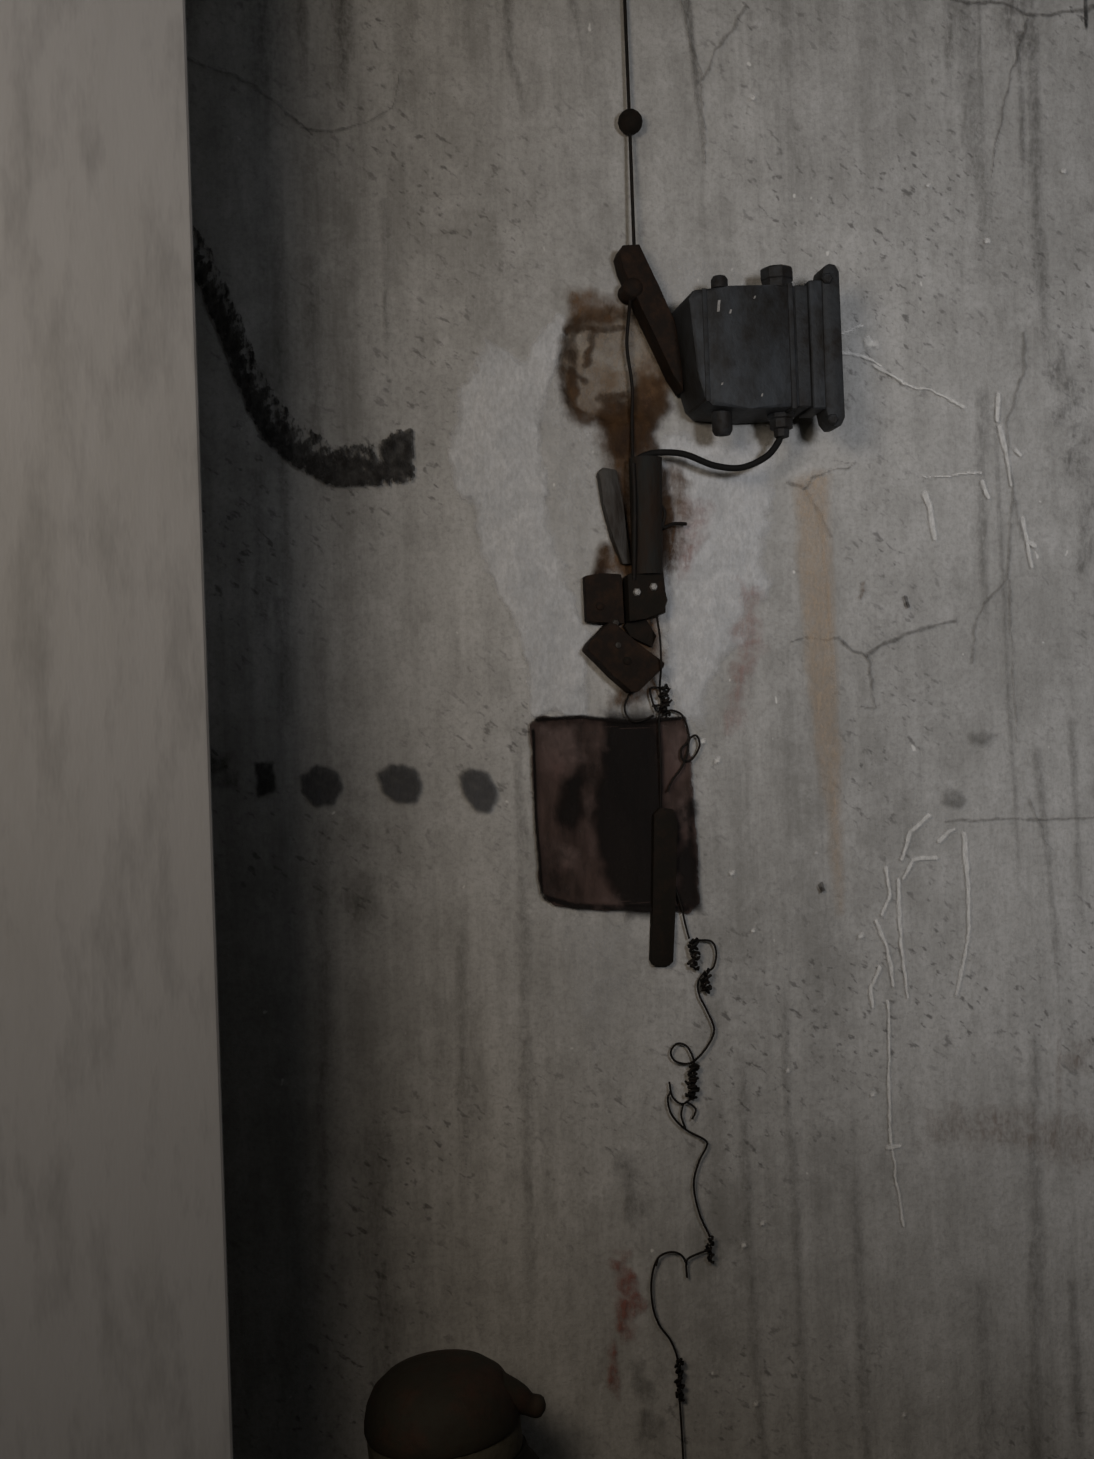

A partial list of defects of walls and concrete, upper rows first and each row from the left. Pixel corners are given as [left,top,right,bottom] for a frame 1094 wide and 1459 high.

rust [575,364,670,656]
rust [662,469,686,570]
crack [902,382,965,408]
rust [530,676,700,914]